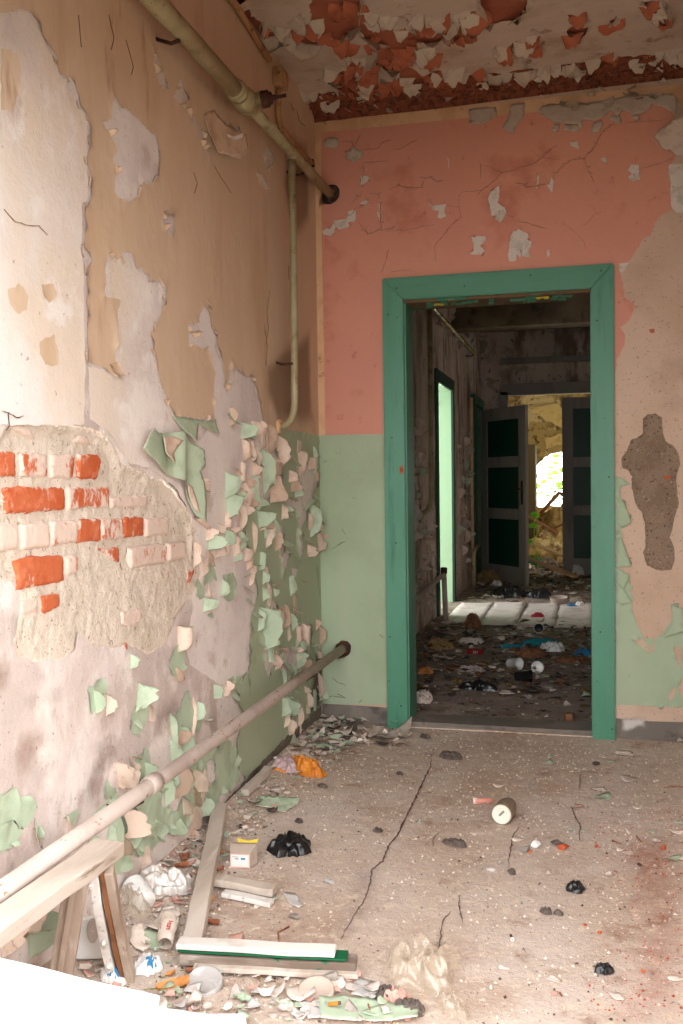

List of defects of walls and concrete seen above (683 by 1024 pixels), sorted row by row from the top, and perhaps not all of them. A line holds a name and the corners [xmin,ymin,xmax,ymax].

crack [343,120,661,272]
peeling [233,0,683,638]
peeling [0,11,370,762]
peeling [0,788,45,853]
peeling [63,809,78,832]
peeling [92,682,159,816]
peeling [88,755,215,870]
peeling [225,775,282,829]
crack [341,755,432,939]